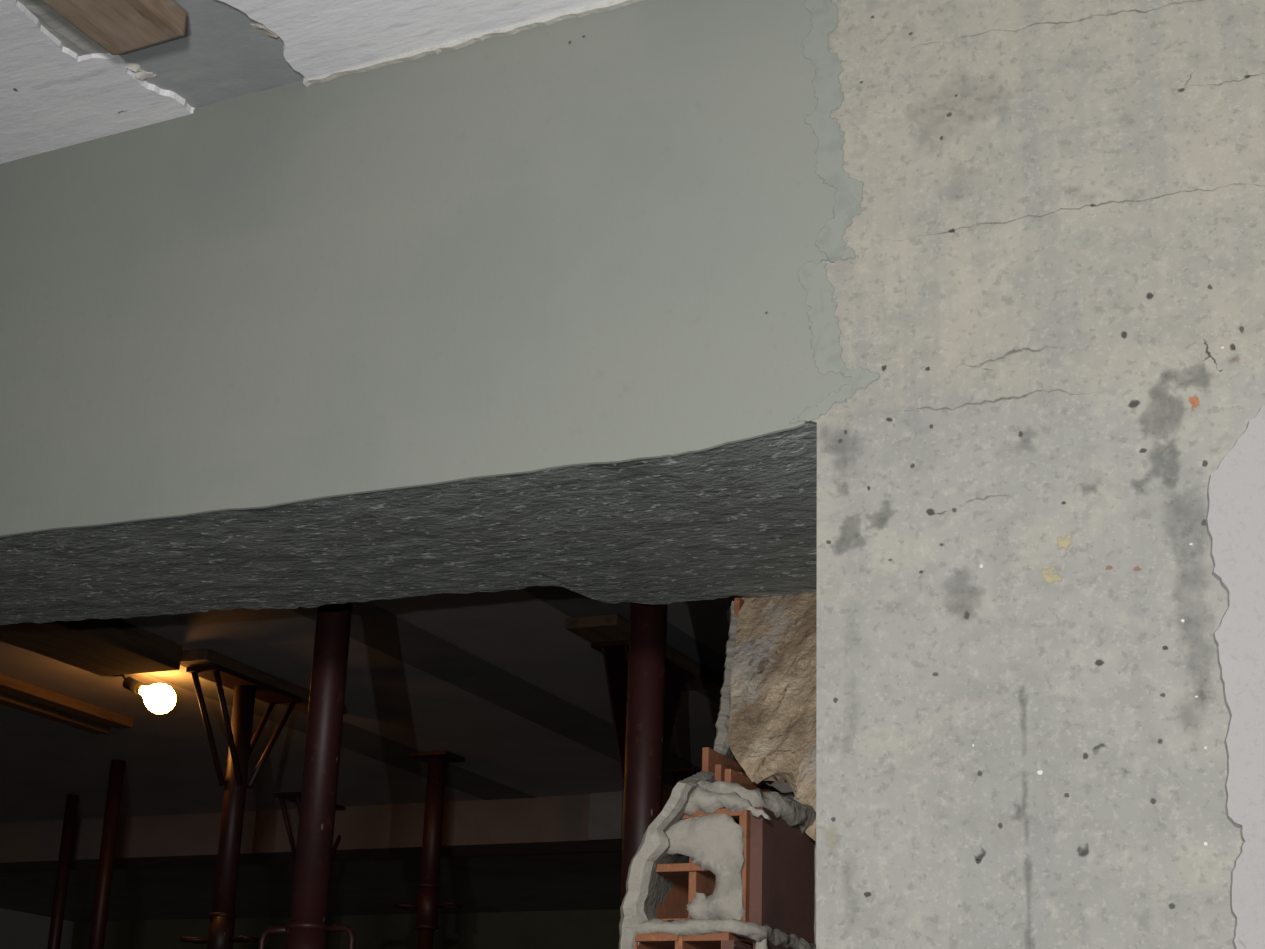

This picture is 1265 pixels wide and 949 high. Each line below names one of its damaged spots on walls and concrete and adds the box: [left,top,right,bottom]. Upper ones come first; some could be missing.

flaking render [17,0,304,108]
flaking render [811,0,1265,949]